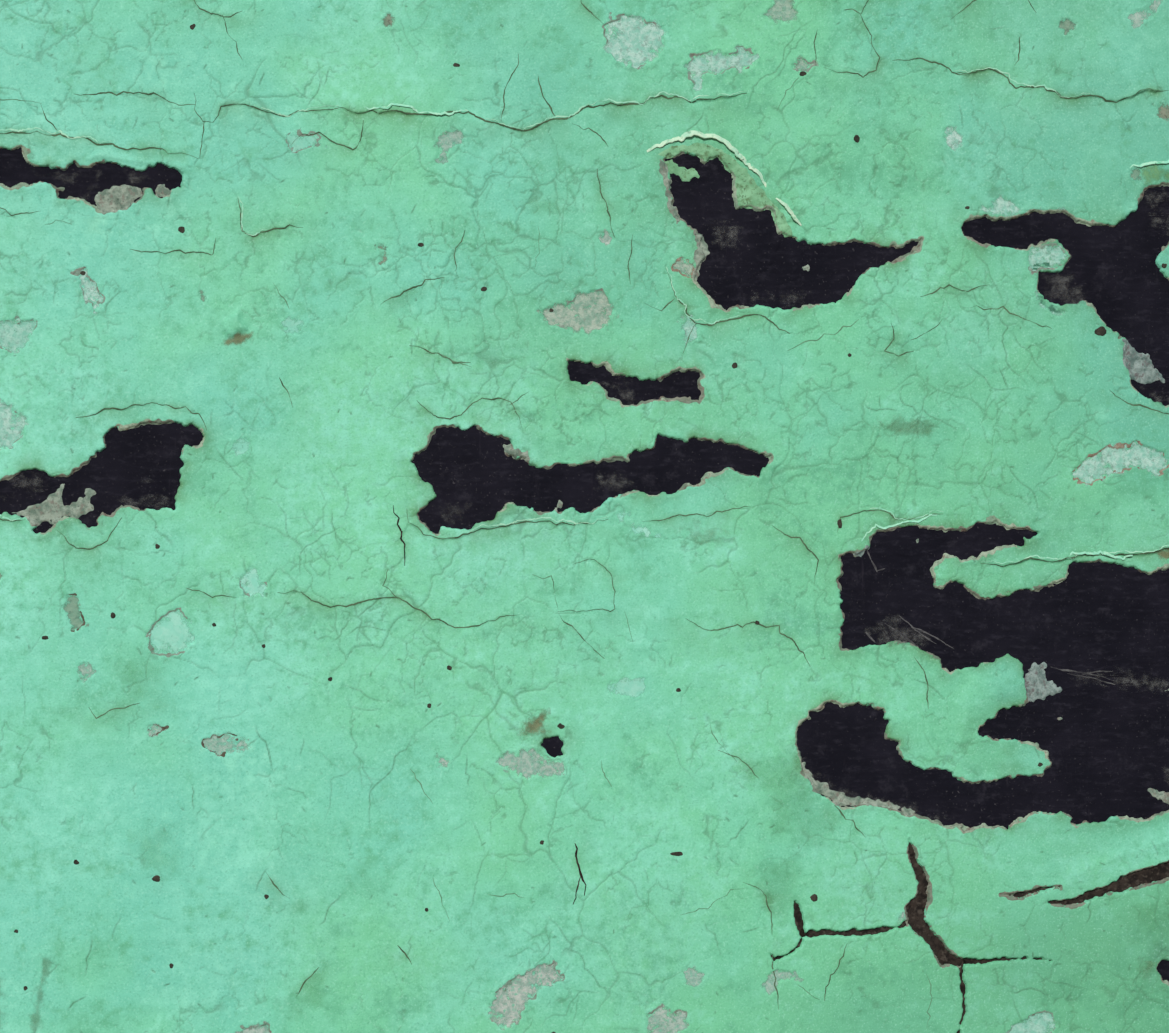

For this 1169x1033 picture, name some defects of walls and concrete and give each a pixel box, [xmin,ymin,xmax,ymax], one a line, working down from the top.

spalling [602,12,664,69]
peeling [0,145,182,215]
peeling [647,130,924,312]
peeling [961,160,1169,408]
peeling [566,358,706,408]
peeling [0,419,205,535]
peeling [410,424,774,537]
spalling [1072,440,1169,486]
peeling [795,514,1169,834]
crack [682,842,1051,1033]
crack [998,860,1169,909]
peeling [1156,959,1169,986]